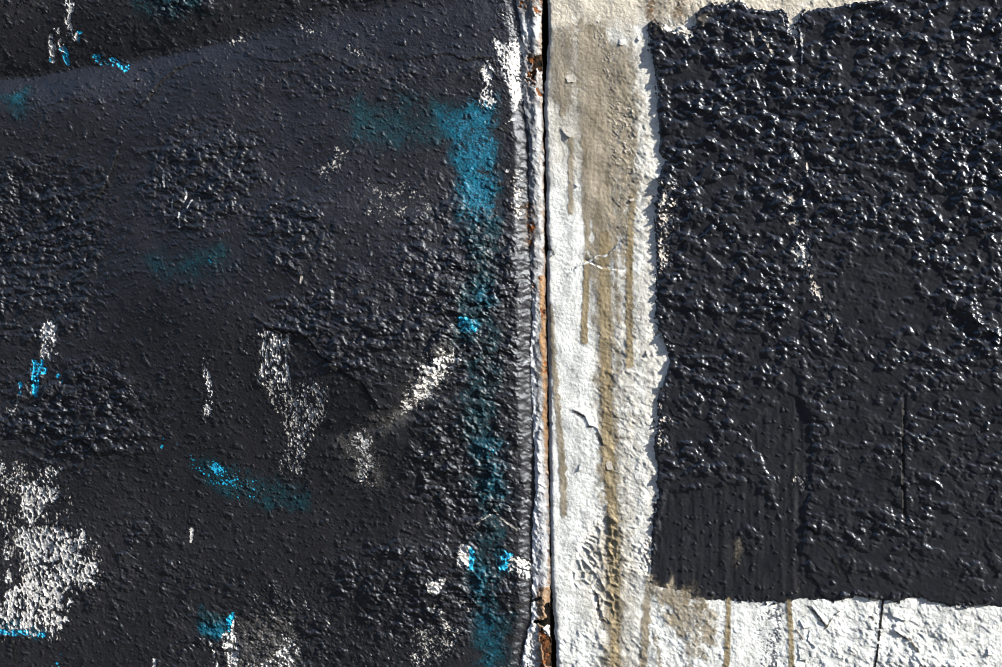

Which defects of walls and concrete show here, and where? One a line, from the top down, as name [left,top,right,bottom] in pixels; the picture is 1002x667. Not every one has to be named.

rust [524,54,542,96]
peeling [457,37,529,208]
peeling [506,169,527,220]
peeling [255,329,328,477]
rust [531,275,549,455]
water stain [549,17,648,667]
peeling [0,460,104,642]
rust [536,587,551,667]
water stain [639,574,732,667]
water stain [786,599,795,667]
crack [870,599,922,667]